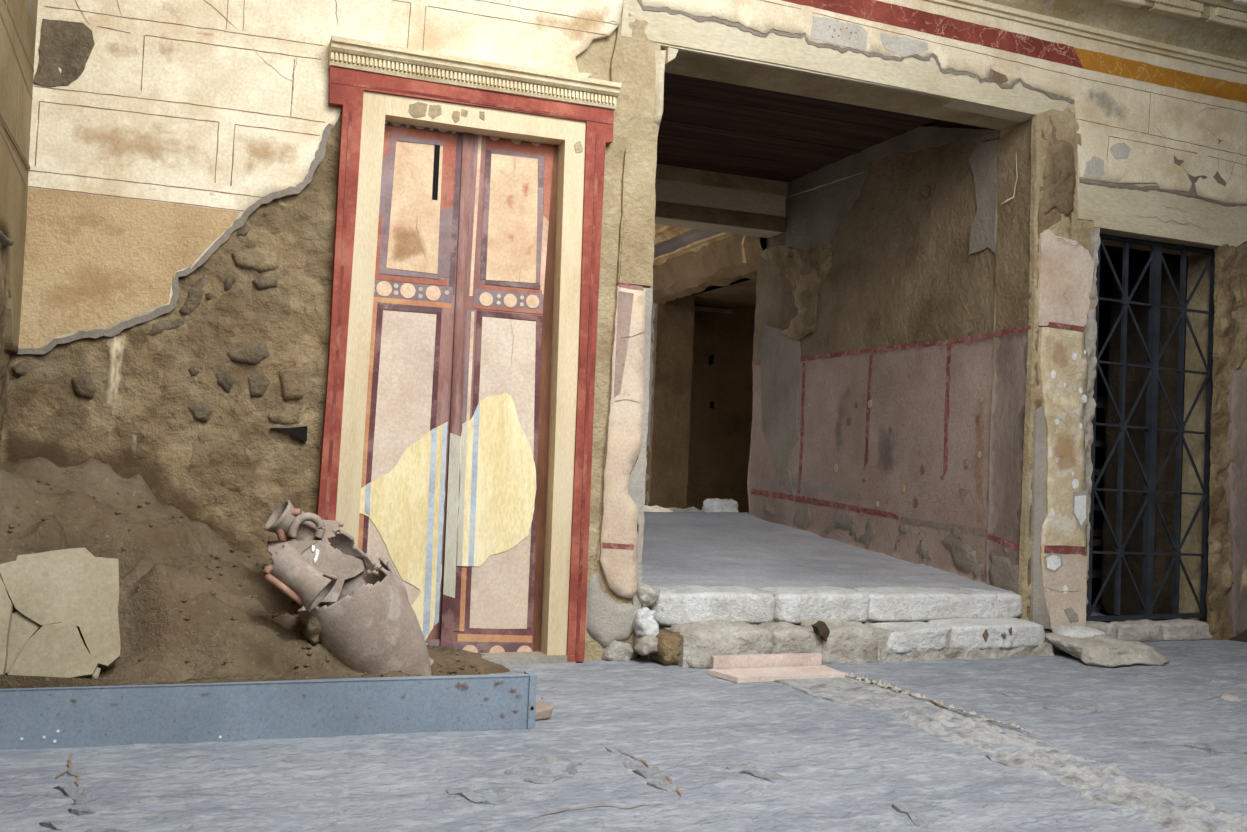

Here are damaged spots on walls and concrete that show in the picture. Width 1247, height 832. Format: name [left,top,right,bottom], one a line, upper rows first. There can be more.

spalling [28,0,95,87]
crack [204,0,297,103]
peeling [811,16,929,57]
peeling [1083,142,1131,180]
flaking render [0,114,341,563]
spalling [761,241,833,341]